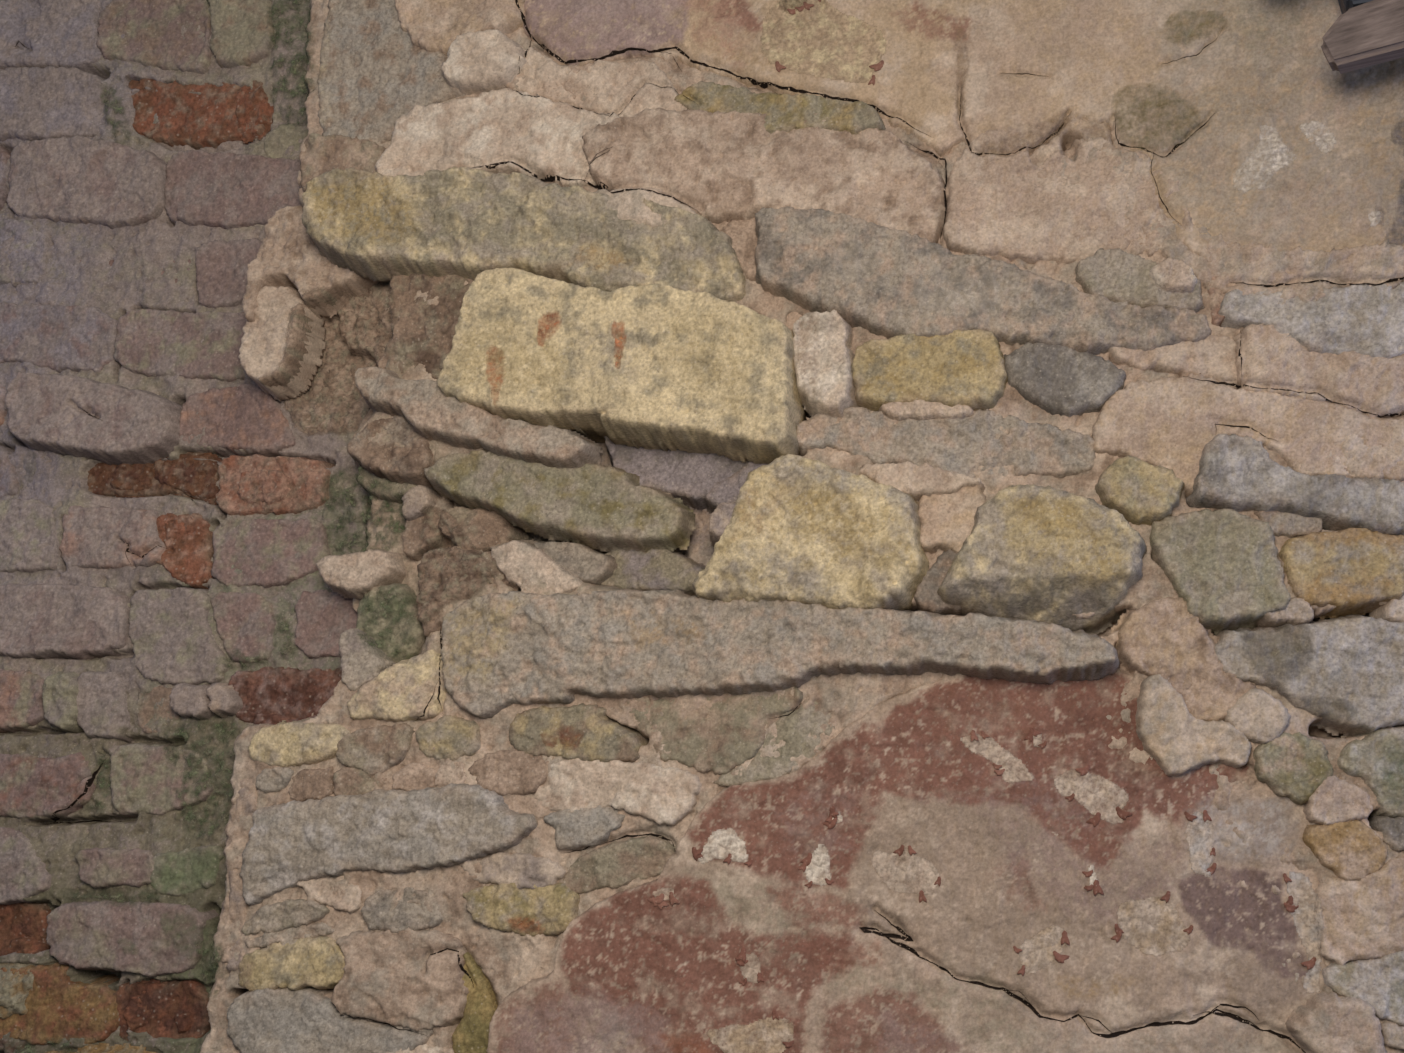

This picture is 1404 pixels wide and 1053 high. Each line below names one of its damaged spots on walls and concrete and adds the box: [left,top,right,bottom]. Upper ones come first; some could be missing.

crack [473,0,1068,240]
crack [859,912,1306,1053]